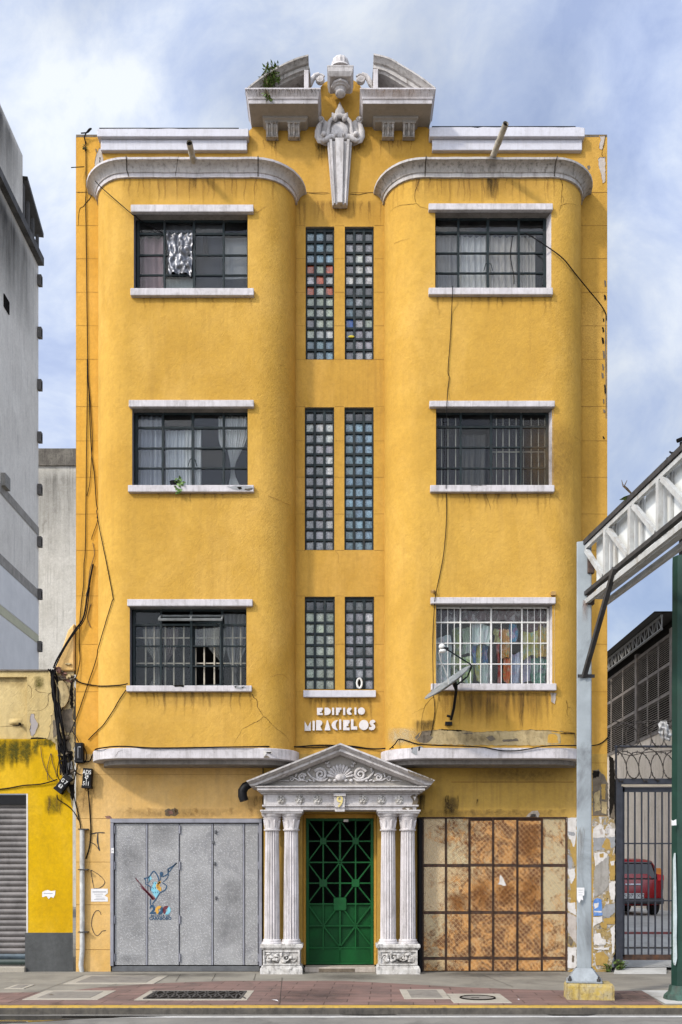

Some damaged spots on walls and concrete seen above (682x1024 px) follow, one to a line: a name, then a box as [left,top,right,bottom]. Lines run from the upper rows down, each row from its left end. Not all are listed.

leakage [0,739,57,765]
spalling [29,671,75,807]
peeling [566,817,577,970]
peeling [592,756,616,971]